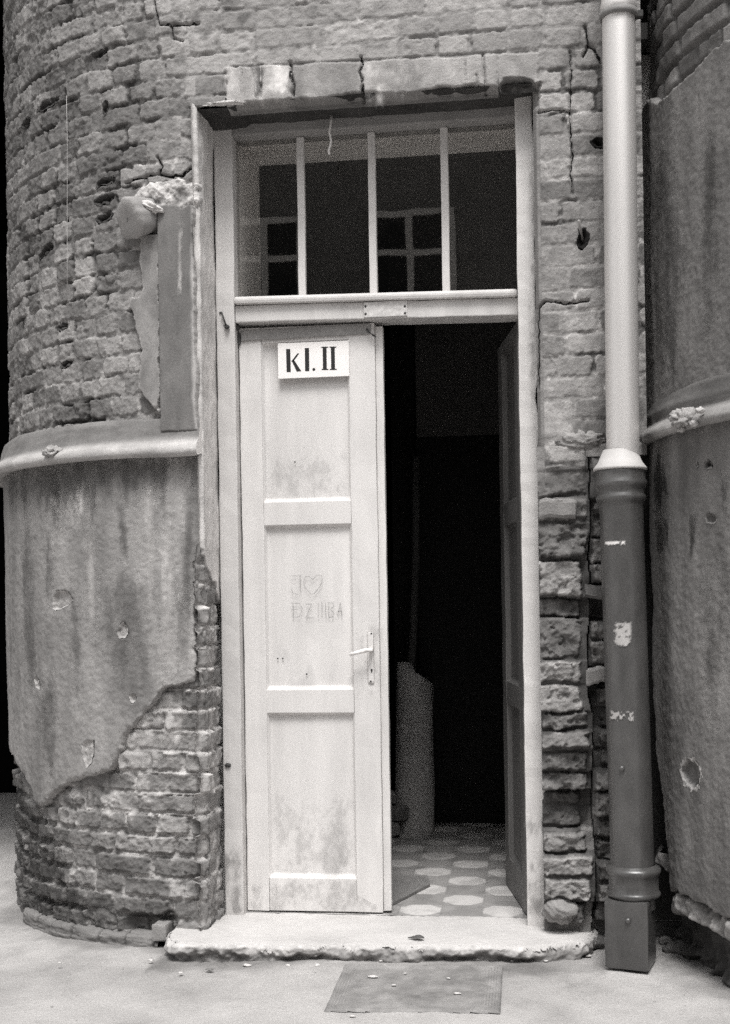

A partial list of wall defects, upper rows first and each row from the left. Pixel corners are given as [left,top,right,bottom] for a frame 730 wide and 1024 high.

crack [155,3,197,40]
crack [357,58,365,94]
crack [541,28,601,187]
spalling [590,137,603,148]
spalling [577,229,589,250]
damp [121,494,154,546]
damp [161,547,174,643]
spalling [12,445,611,963]
spalling [640,446,730,986]